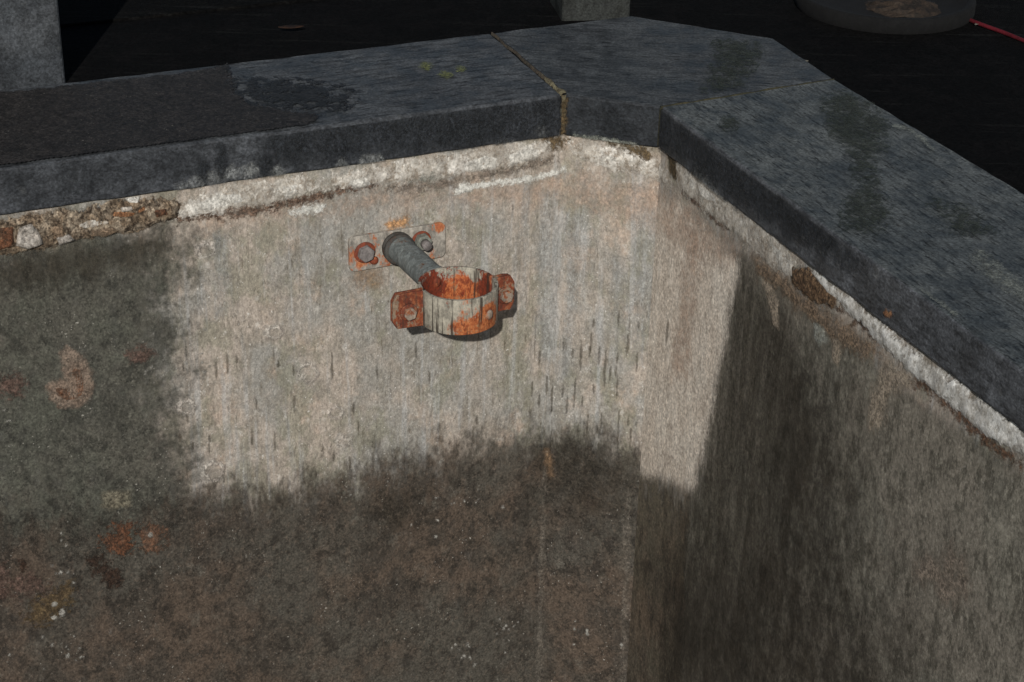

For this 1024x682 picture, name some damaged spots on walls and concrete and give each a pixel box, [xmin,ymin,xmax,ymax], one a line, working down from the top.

leakage [0,63,562,189]
peeling [0,141,550,256]
peeling [568,136,1024,454]
rust [47,347,93,408]
rust [85,520,169,589]